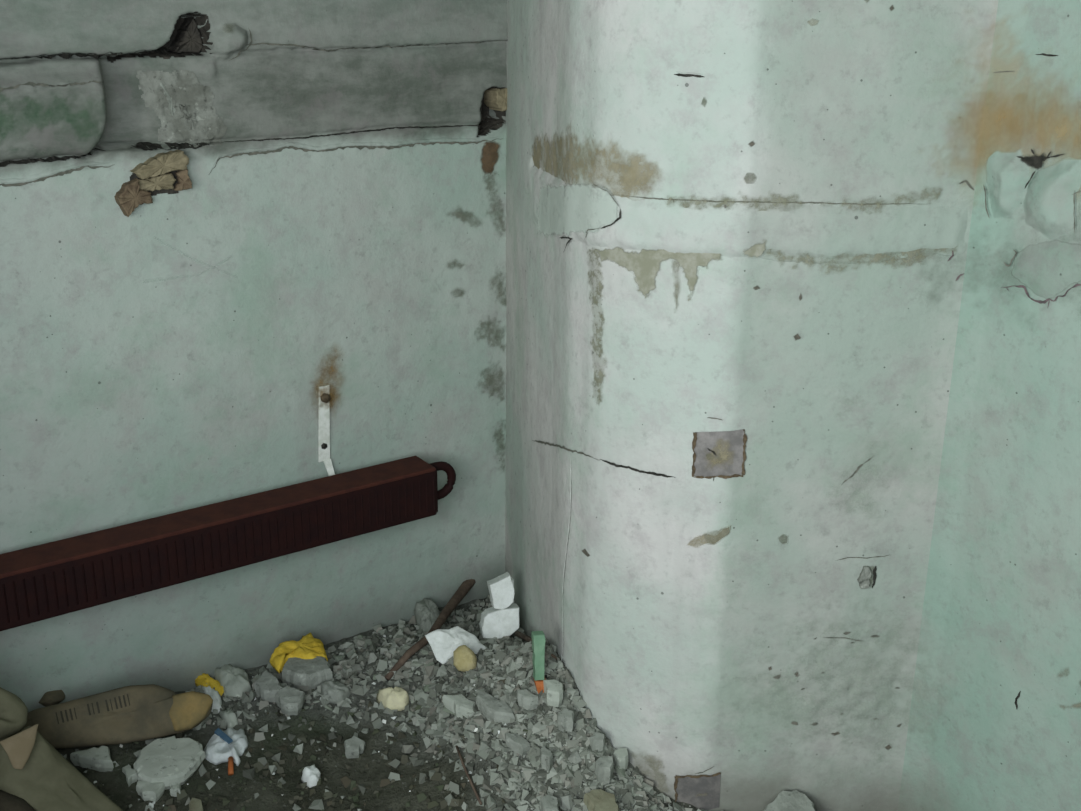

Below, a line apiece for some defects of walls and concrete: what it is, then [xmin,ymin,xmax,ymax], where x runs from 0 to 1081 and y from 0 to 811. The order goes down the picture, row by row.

crack [0,46,170,92]
crack [246,40,506,52]
spalling [107,12,507,217]
crack [0,121,493,167]
peeling [592,247,721,301]
crack [532,440,675,478]